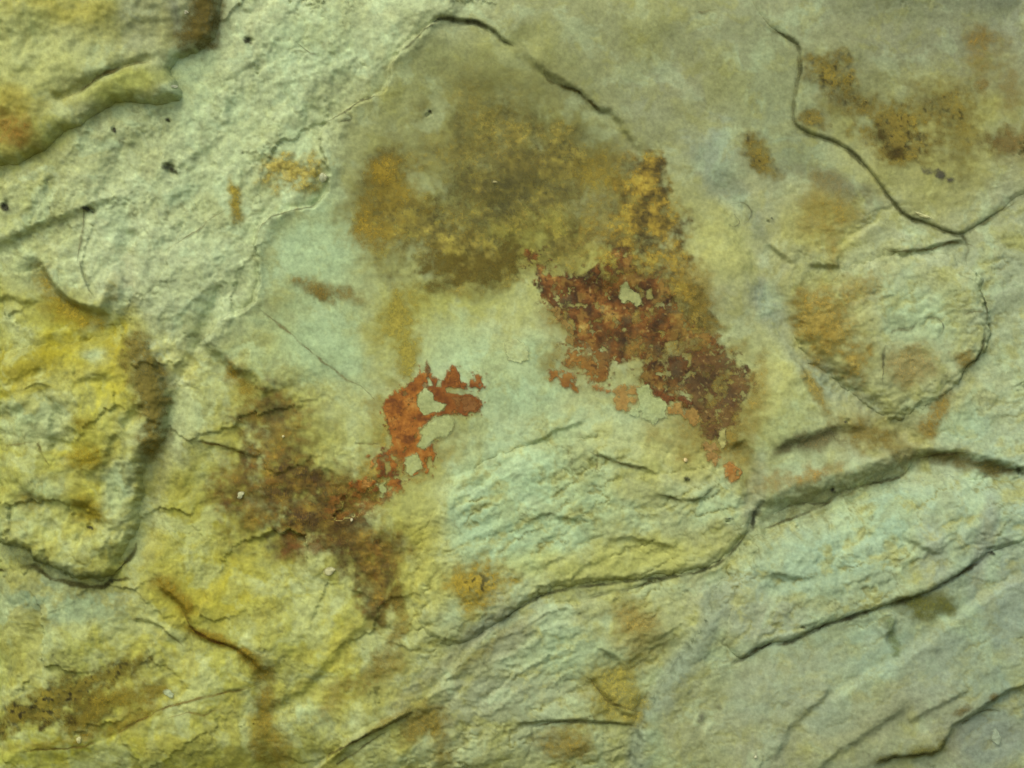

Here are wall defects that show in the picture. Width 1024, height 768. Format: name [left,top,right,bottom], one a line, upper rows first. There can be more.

crack [412,17,507,43]
crack [551,82,598,110]
crack [773,30,865,166]
water stain [806,50,975,166]
water stain [352,82,629,376]
crack [885,192,990,252]
corrosion [523,150,757,482]
corrosion [329,361,486,520]
crack [860,474,903,487]
crack [29,550,135,589]
water stain [208,388,409,690]